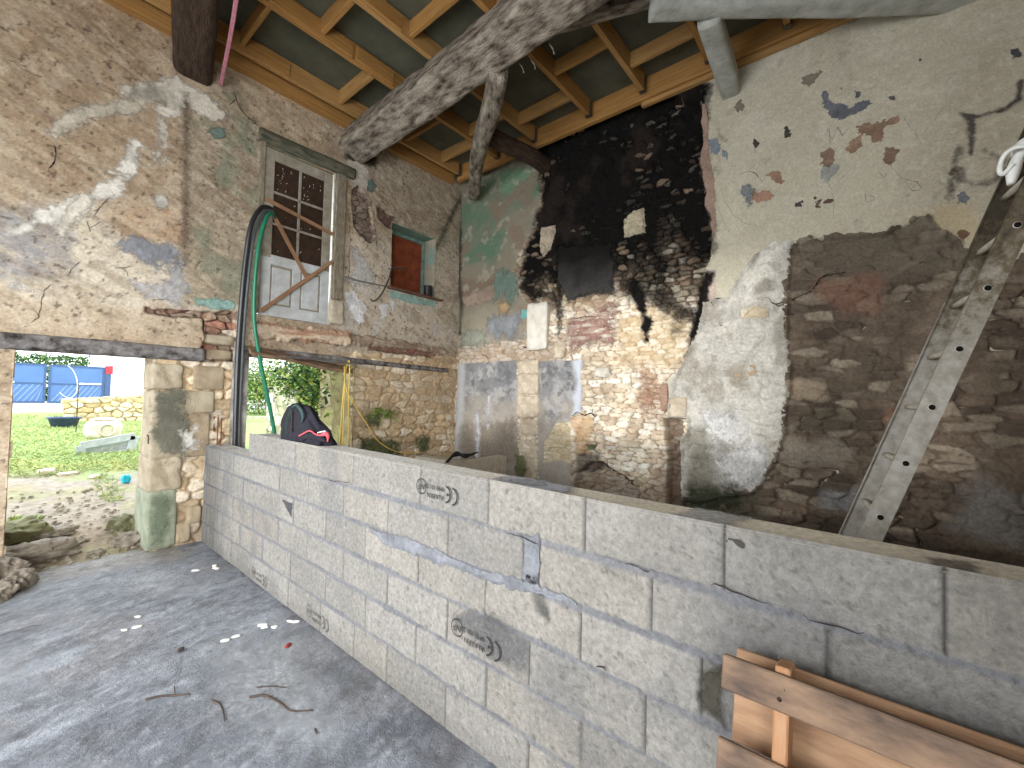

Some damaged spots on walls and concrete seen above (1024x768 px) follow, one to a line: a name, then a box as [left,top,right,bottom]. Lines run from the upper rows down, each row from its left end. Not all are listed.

peeling [801,70,900,183]
spalling [344,185,395,324]
crack [767,272,845,307]
spalling [566,302,619,352]
spalling [668,214,970,534]
leakage [180,427,198,450]
leakage [459,396,516,462]
spalling [882,253,1024,567]
crack [710,583,763,603]
crack [803,614,861,634]